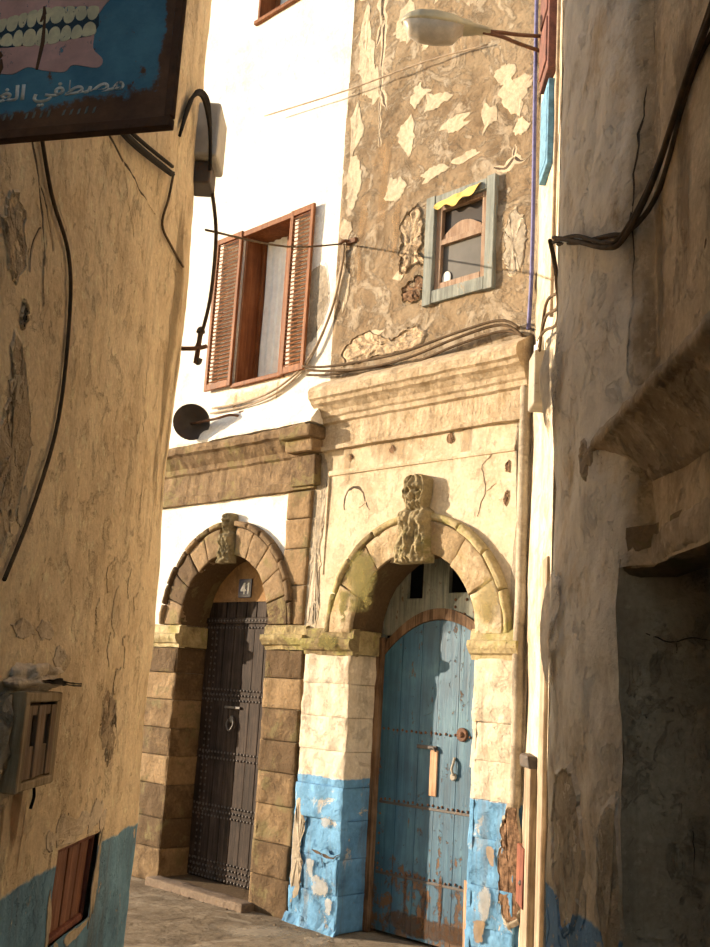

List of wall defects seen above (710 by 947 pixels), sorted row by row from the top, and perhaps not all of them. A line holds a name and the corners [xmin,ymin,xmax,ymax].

peeling [340,0,380,248]
peeling [397,82,453,157]
peeling [438,63,533,136]
peeling [420,149,482,184]
spalling [392,203,426,304]
spalling [502,206,528,277]
spalling [339,324,428,367]
crack [477,455,496,517]
peeling [290,798,332,915]
rust [385,873,463,945]
spalling [473,803,522,943]
spalling [545,762,625,947]